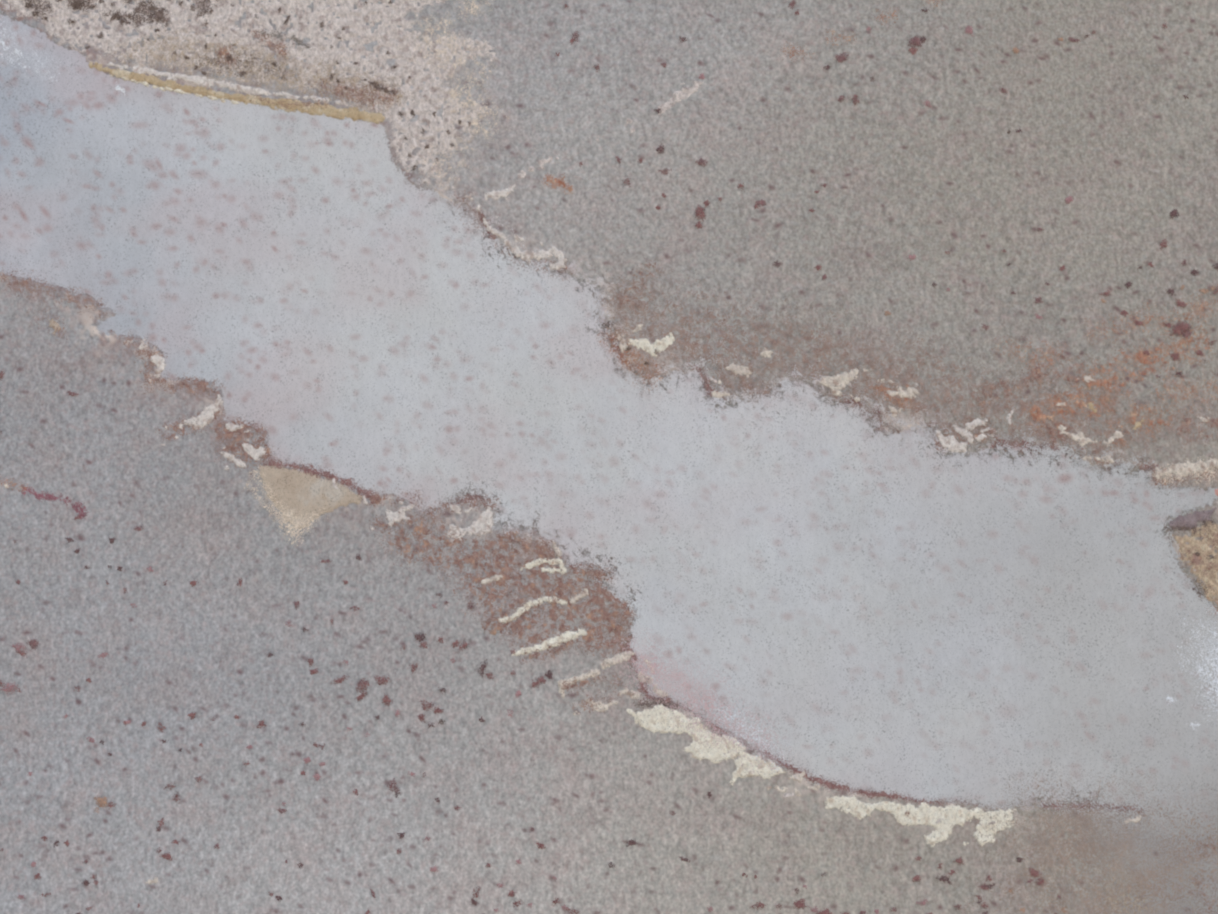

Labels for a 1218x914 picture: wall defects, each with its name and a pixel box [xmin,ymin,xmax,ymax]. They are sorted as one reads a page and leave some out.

spalling [0,0,573,283]
spalling [122,331,279,474]
spalling [596,321,675,394]
spalling [704,347,776,402]
spalling [799,369,920,418]
spalling [932,410,1013,454]
spalling [364,484,501,543]
spalling [1171,512,1218,619]
corrosion [374,508,640,717]
corrosion [331,659,400,719]
corrosion [417,687,445,729]
spalling [566,659,1017,847]